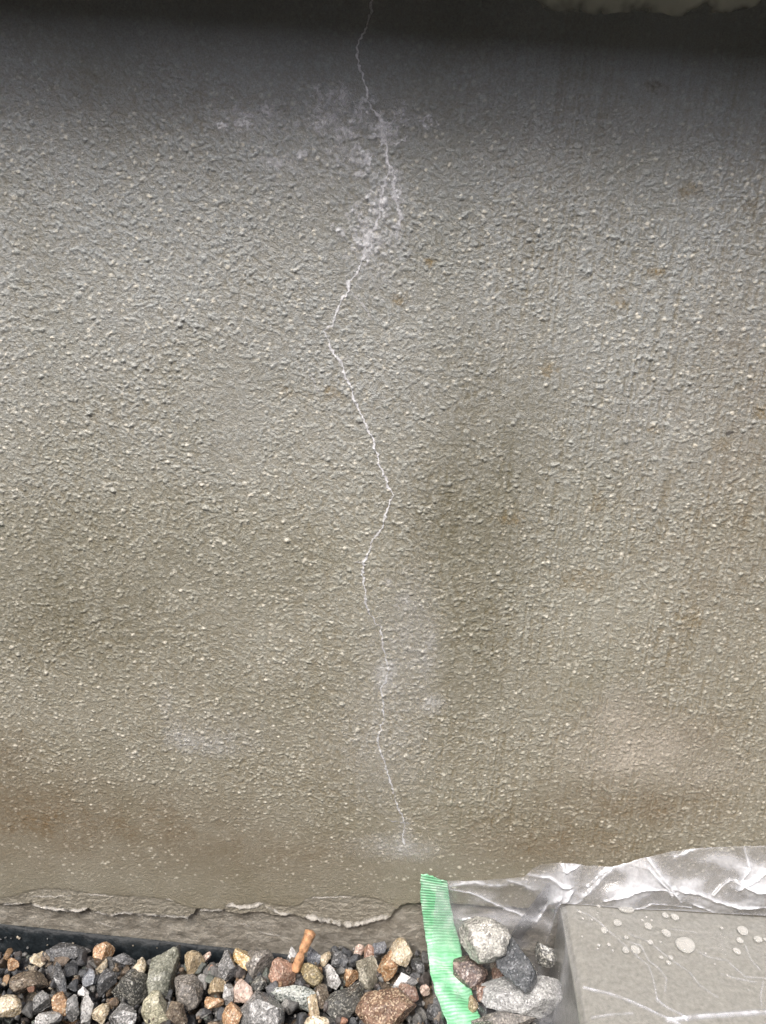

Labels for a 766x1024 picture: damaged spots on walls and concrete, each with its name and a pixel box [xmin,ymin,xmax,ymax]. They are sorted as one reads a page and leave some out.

water stain [295,99,405,176]
water stain [336,169,402,263]
crack [323,0,406,845]
peeling [34,896,86,913]
peeling [214,903,262,911]
peeling [306,915,387,929]